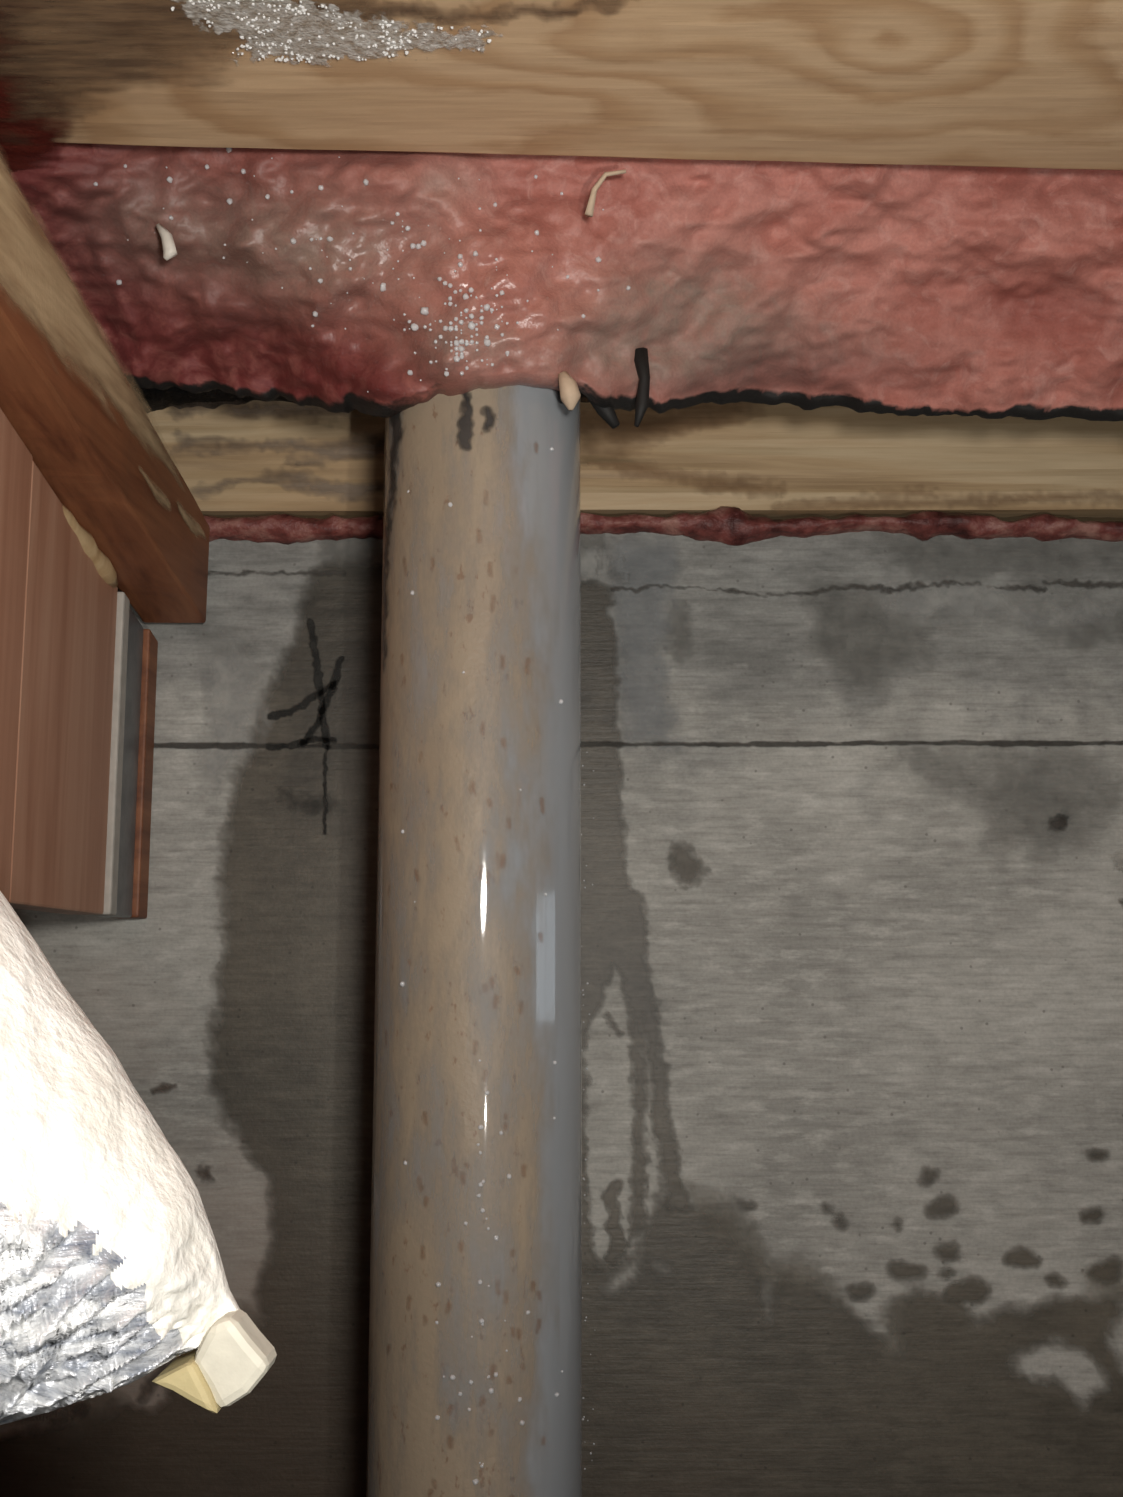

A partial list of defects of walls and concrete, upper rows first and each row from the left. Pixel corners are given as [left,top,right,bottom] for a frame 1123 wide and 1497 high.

leakage [0,0,622,171]
leakage [0,539,383,1497]
leakage [581,535,1123,1497]